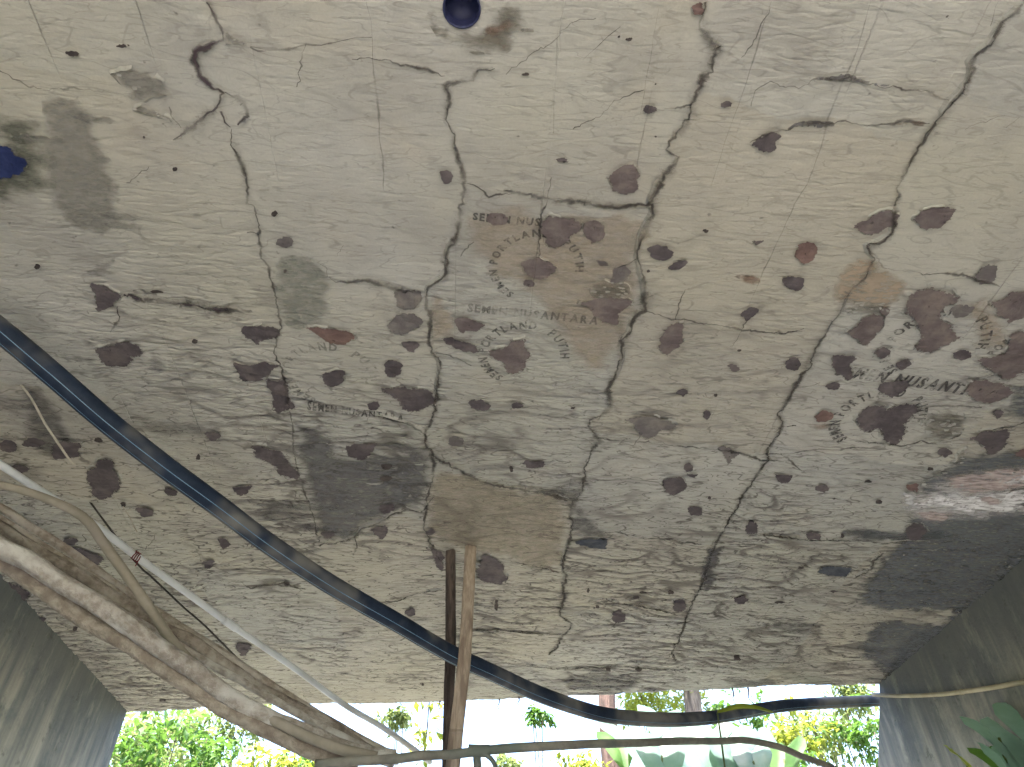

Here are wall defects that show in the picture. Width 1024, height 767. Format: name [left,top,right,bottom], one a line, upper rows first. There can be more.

leakage [0,101,112,232]
crack [173,2,1016,672]
leakage [291,429,428,538]
leakage [847,452,1024,680]